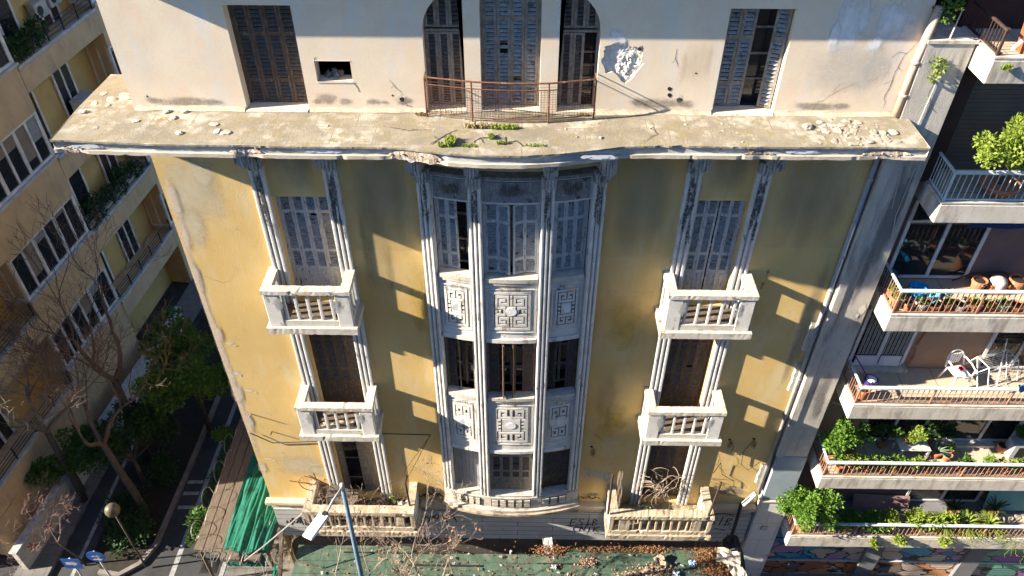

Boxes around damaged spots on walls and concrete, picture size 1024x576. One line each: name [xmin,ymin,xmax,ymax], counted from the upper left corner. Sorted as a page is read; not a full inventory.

flaking render [601,41,644,82]
crack [804,45,915,109]
spalling [389,150,441,165]